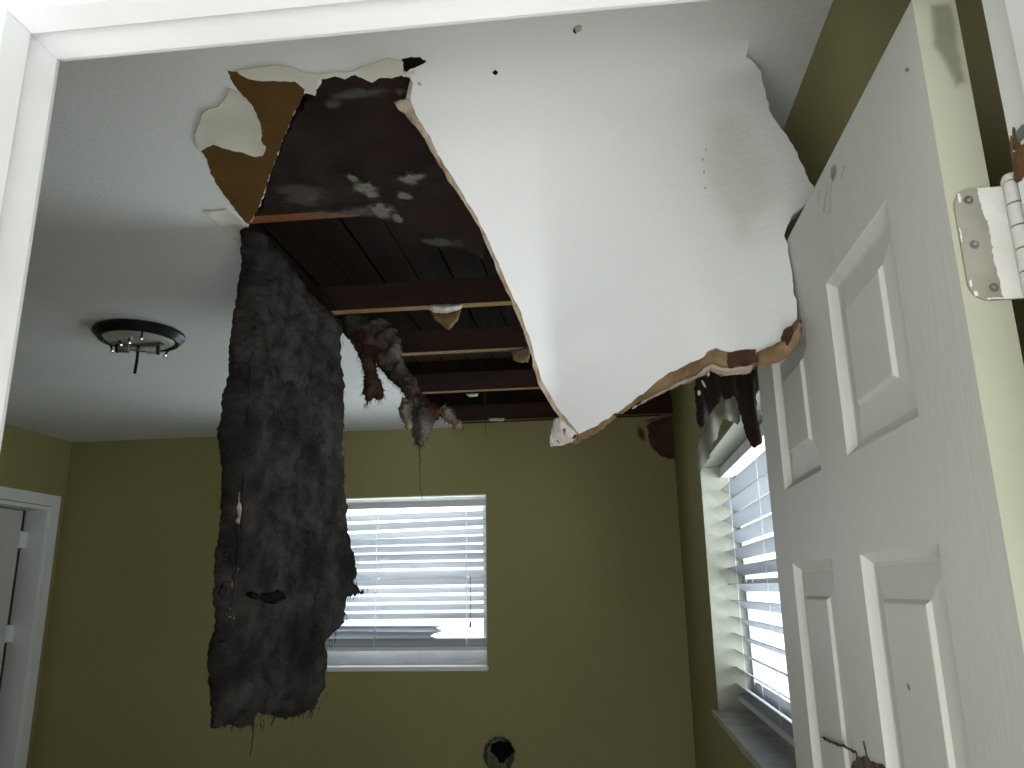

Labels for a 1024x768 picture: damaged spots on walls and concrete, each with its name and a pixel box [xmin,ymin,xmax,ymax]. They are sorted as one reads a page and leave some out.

mould [327,89,380,108]
mould [279,175,402,222]
mould [397,174,424,199]
spalling [550,417,577,447]
peeling [647,416,675,459]
hole [483,737,515,768]